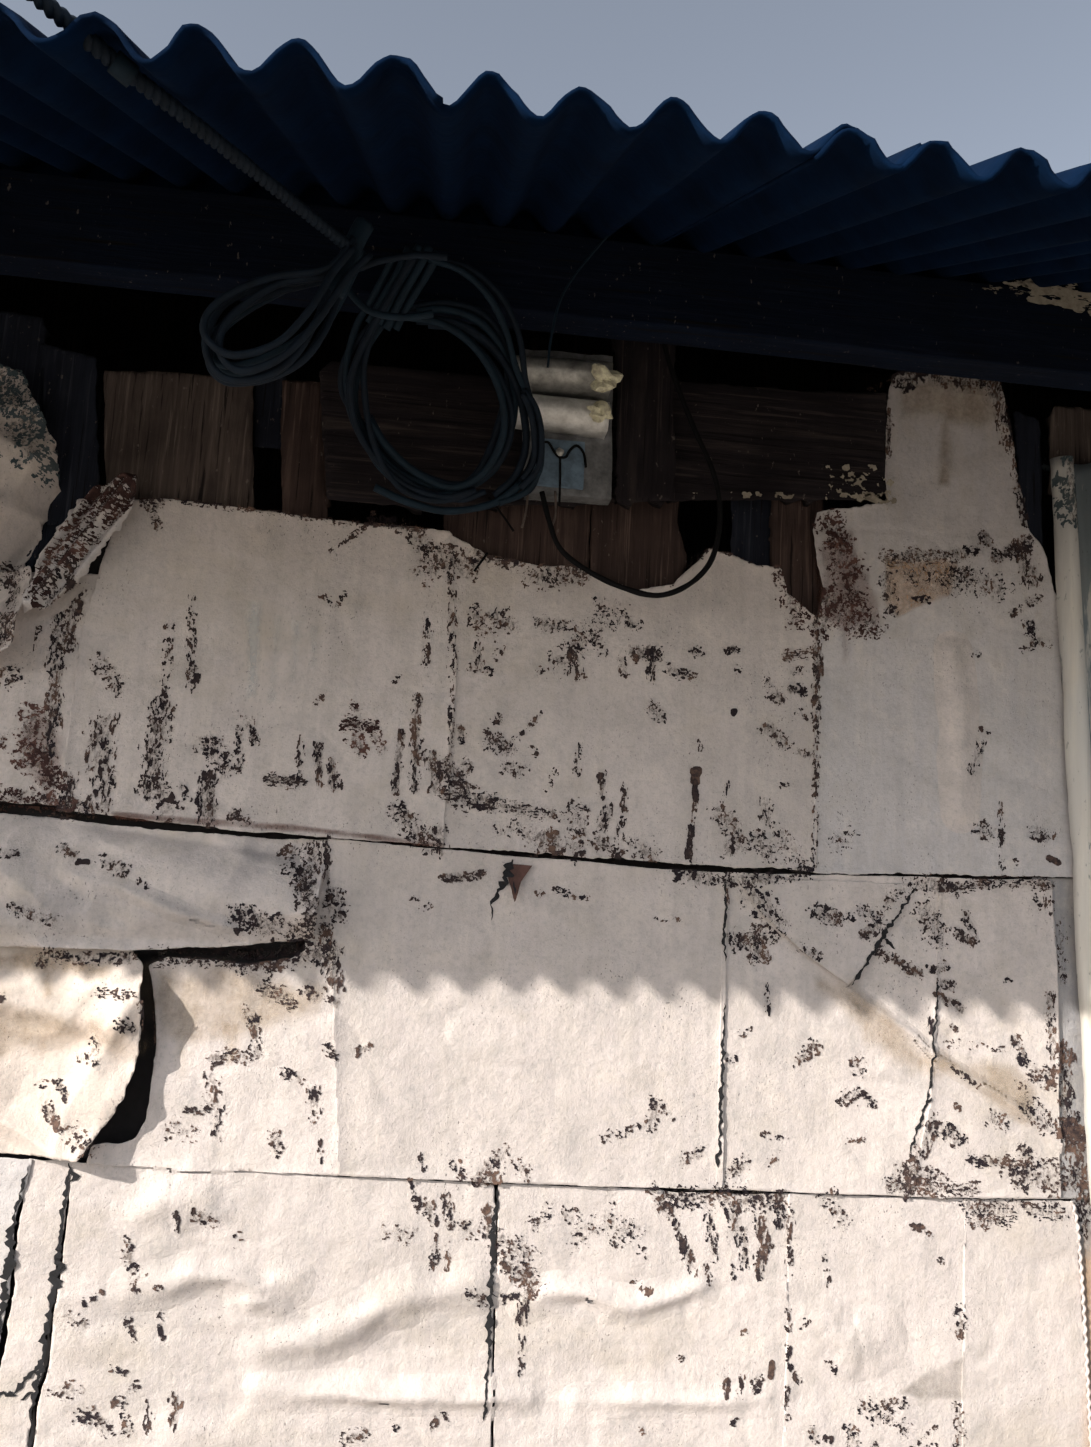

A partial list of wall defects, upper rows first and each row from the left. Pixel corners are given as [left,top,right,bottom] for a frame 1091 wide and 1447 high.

peeling [983,279,1091,316]
peeling [0,364,1091,1240]
crack [720,881,728,961]
crack [852,888,916,985]
crack [715,1005,726,1167]
crack [910,980,940,1152]
crack [0,1163,80,1447]
peeling [120,1235,163,1293]
crack [483,1189,499,1421]
peeling [645,1130,796,1287]